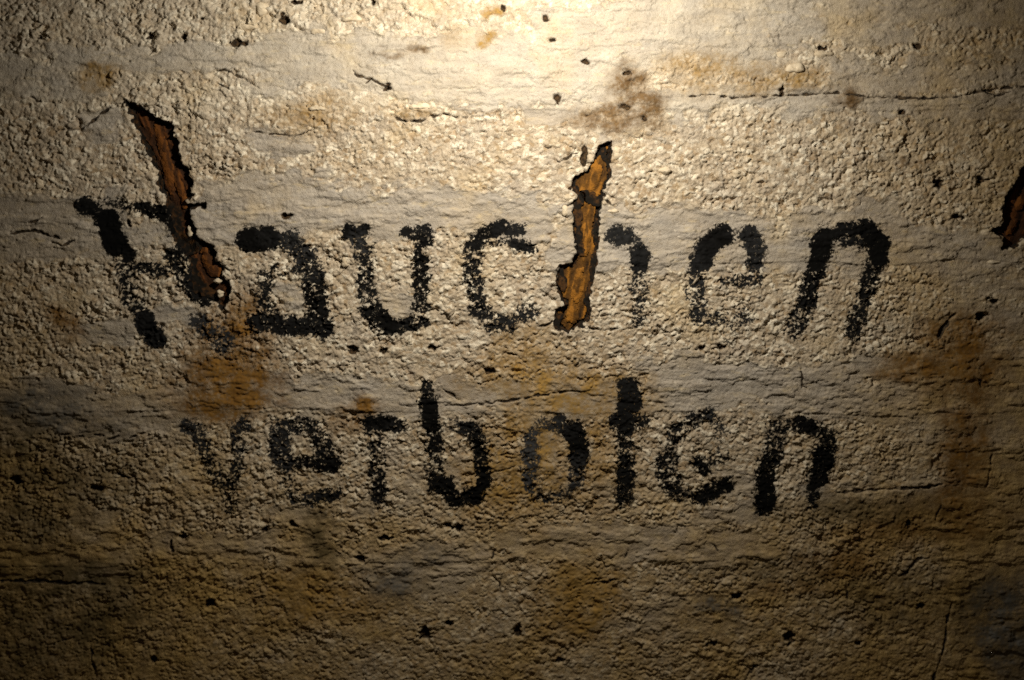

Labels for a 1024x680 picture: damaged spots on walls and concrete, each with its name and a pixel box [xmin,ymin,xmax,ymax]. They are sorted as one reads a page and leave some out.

spalling [54,68,1020,226]
crack [688,86,1024,100]
spalling [0,227,968,680]